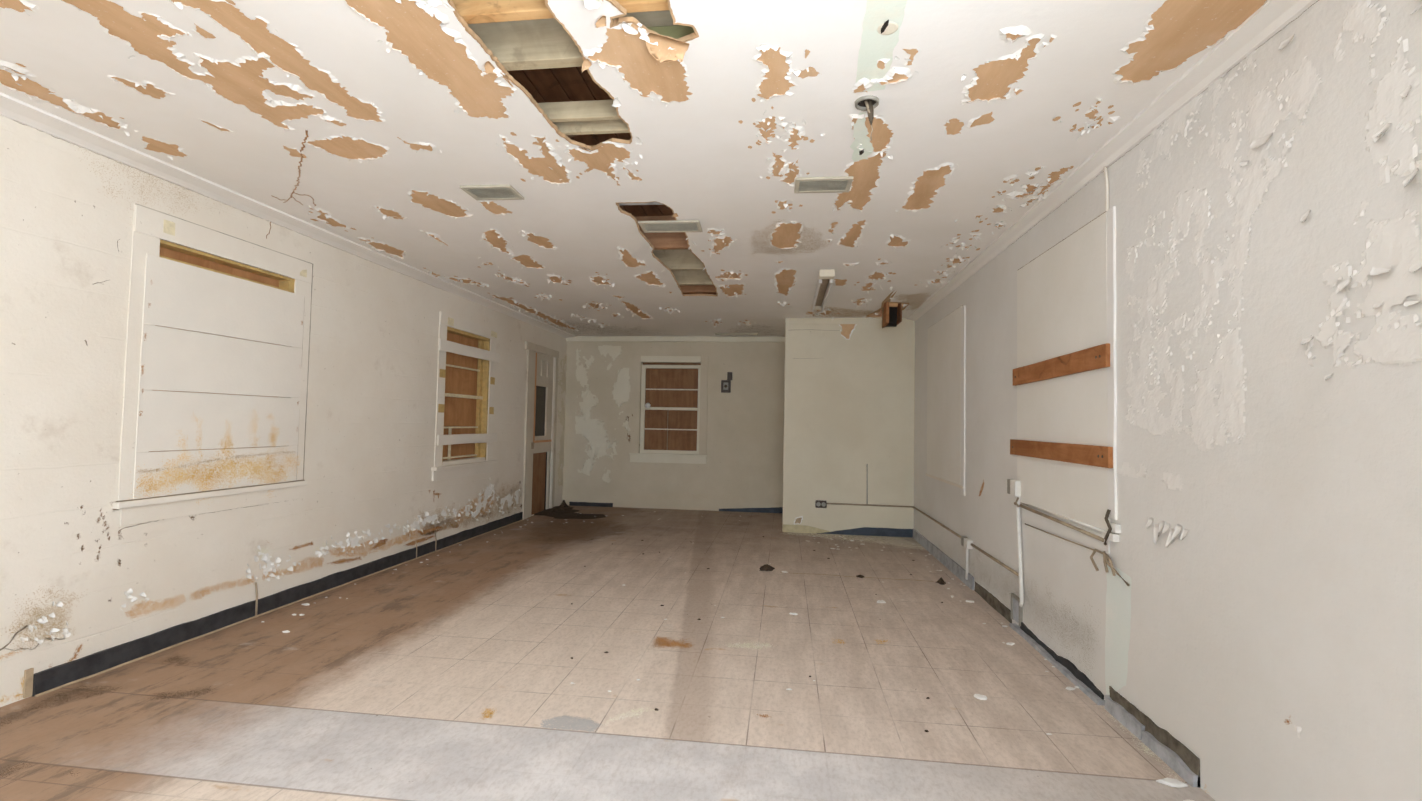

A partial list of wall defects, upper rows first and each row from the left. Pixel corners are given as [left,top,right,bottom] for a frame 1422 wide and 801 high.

peeling [0,60,189,160]
peeling [60,0,442,163]
peeling [344,0,644,186]
peeling [582,0,693,107]
peeling [944,25,1058,135]
peeling [1112,0,1270,84]
crack [14,120,445,291]
peeling [373,189,681,332]
peeling [738,44,921,340]
peeling [1301,200,1422,380]
damp [131,409,300,521]
crack [0,625,65,651]